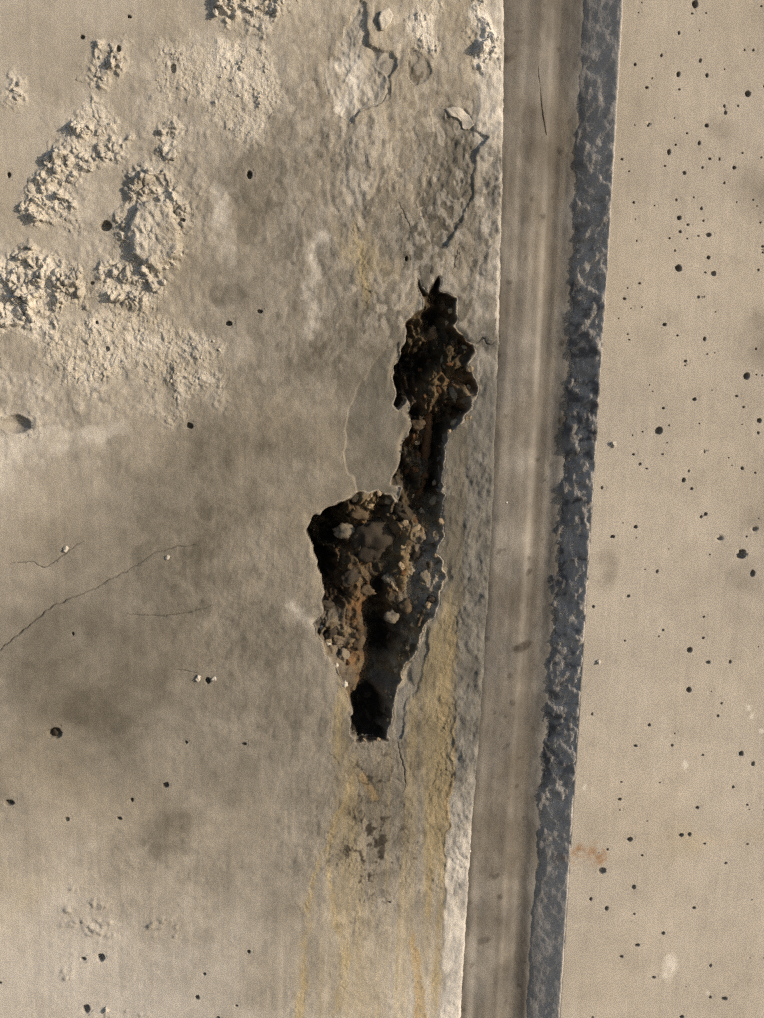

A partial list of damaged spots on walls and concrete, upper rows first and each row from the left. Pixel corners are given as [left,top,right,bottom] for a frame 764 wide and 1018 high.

peeling [323,0,432,124]
spalling [457,0,500,48]
spalling [0,0,305,430]
peeling [416,104,490,250]
spalling [304,274,479,744]
crack [0,538,200,655]
rust [288,574,472,1018]